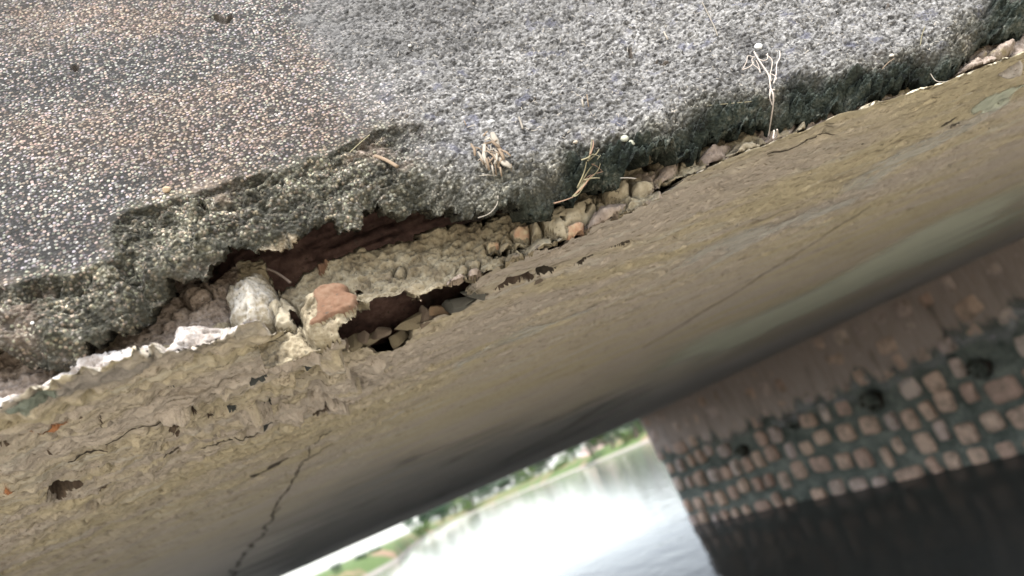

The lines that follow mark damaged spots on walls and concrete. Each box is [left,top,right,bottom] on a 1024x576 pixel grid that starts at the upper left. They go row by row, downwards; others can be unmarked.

spalling [0,0,1024,398]
peeling [162,265,556,437]
crack [229,431,333,576]